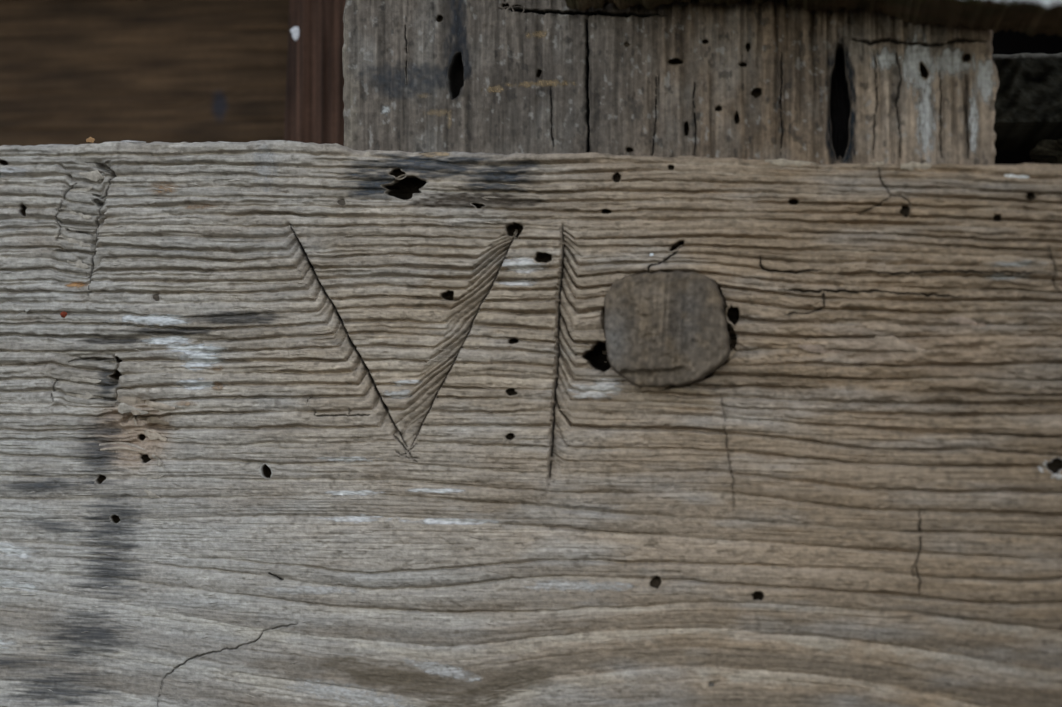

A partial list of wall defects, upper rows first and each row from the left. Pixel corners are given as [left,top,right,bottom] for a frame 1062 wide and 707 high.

crack [498,0,667,156]
crack [851,37,987,215]
crack [719,393,736,511]
crack [910,509,923,597]
crack [156,623,298,707]